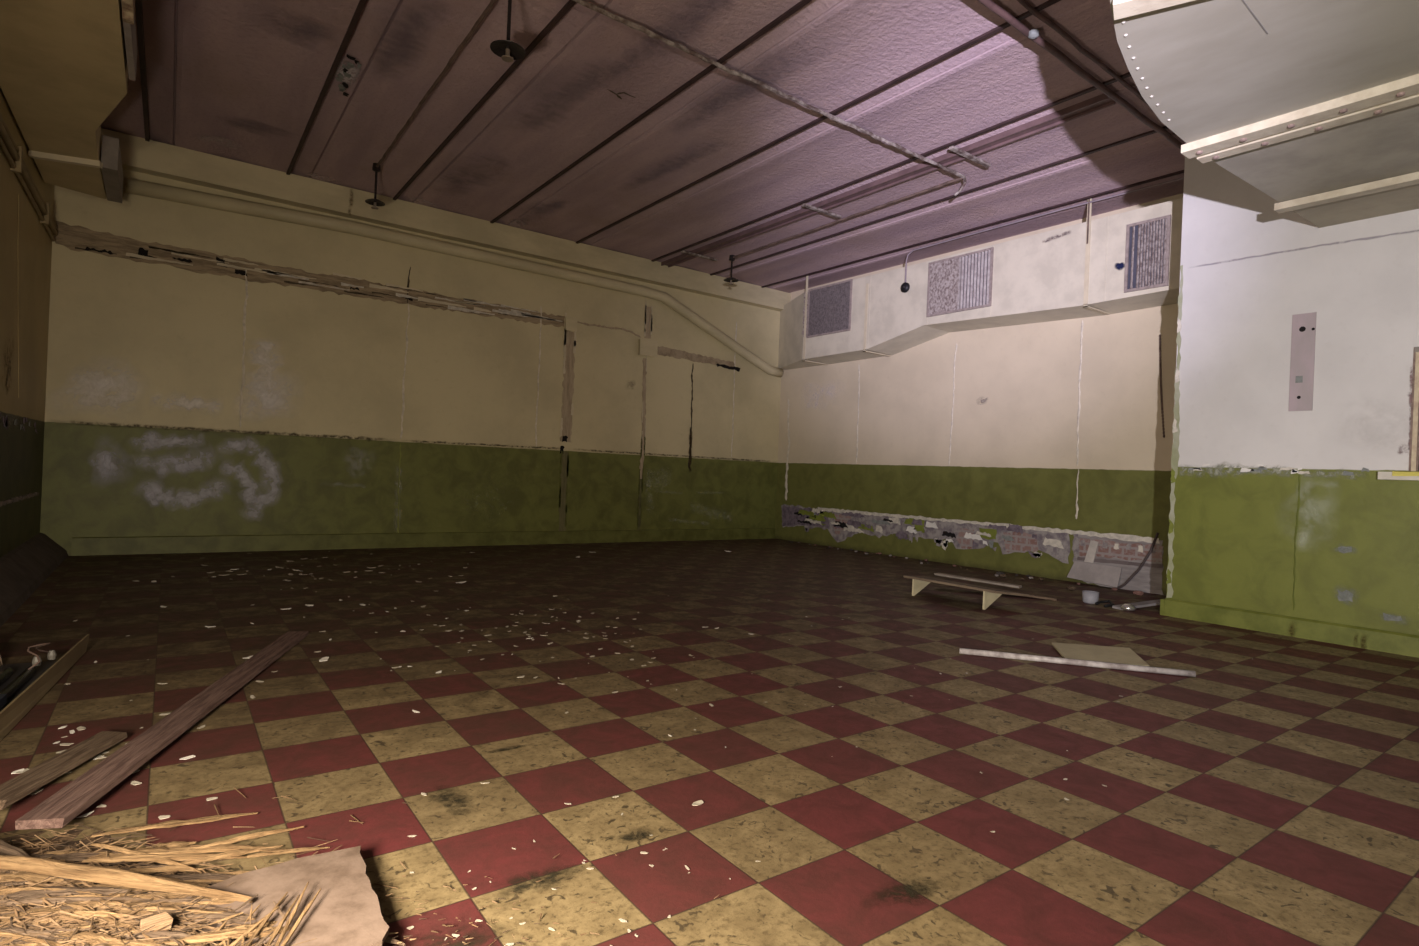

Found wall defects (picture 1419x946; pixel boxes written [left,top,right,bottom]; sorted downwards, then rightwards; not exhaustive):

water stain [144,435,278,517]
peeling [55,221,577,531]
spalling [781,265,1369,598]